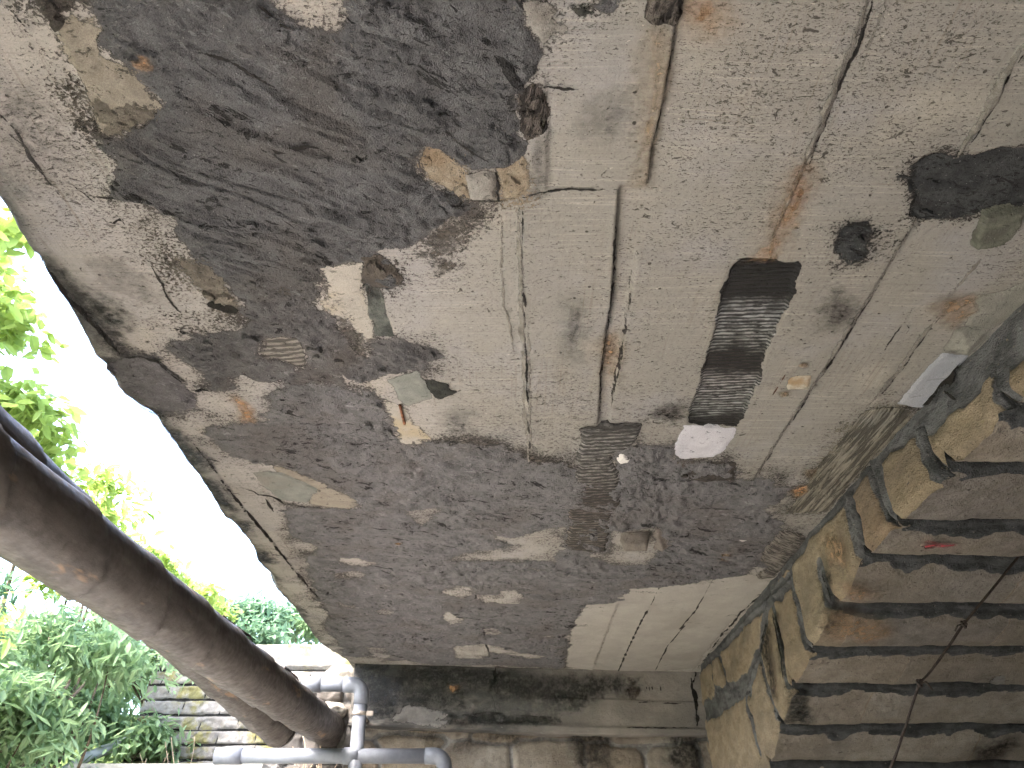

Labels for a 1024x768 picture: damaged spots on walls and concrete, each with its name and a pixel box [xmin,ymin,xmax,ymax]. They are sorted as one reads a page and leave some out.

crack [652,33,675,147]
crack [809,1,873,164]
spalling [3,0,913,671]
crack [438,108,619,453]
crack [599,219,632,409]
crack [759,257,895,474]
spalling [810,135,1024,279]
crack [193,444,318,597]
crack [618,588,659,671]
crack [627,585,761,729]